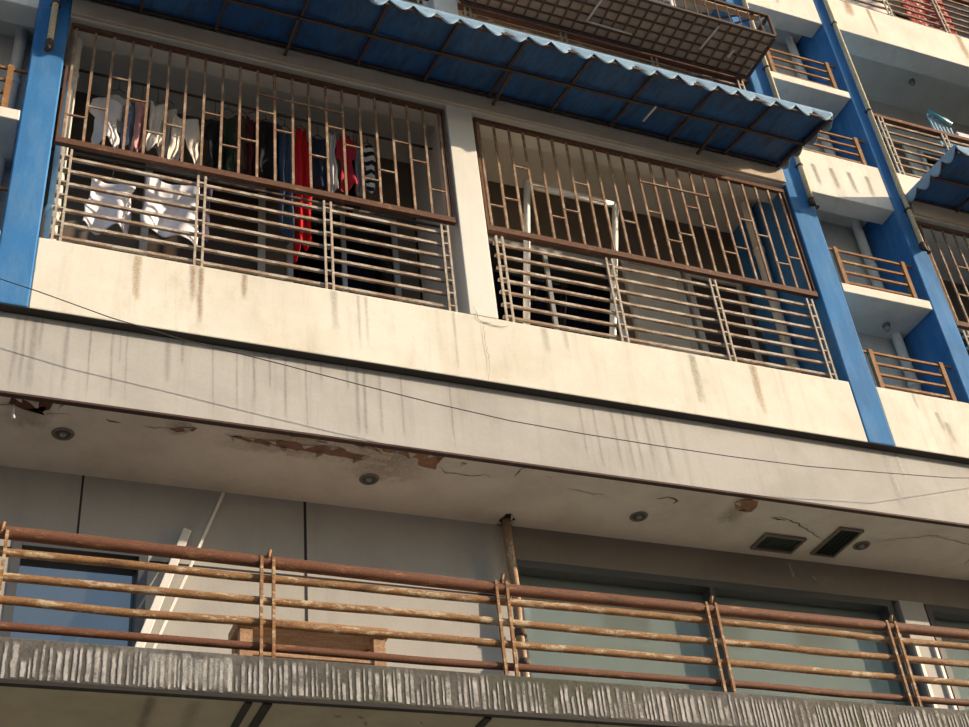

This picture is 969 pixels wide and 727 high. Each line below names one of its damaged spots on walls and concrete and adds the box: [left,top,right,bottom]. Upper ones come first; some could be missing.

crack [474,308,506,378]
peeling [9,398,65,419]
peeling [228,435,444,470]
crack [770,516,823,540]